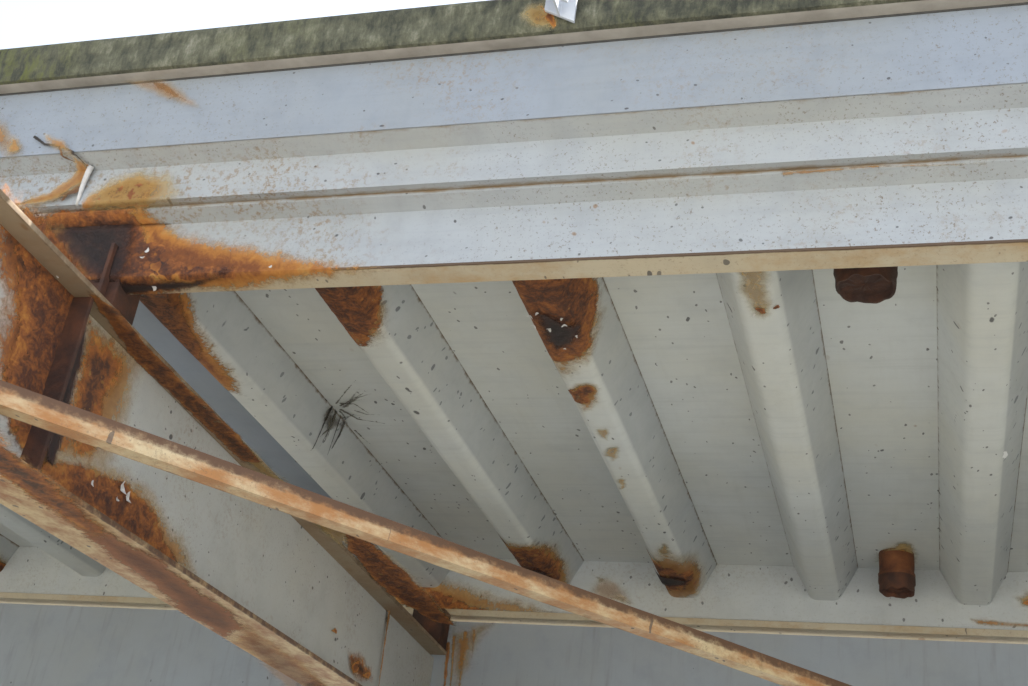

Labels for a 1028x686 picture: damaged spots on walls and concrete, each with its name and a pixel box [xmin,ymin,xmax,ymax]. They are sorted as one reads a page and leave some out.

rust [0,174,383,481]
rust [512,278,601,372]
rust [568,384,597,409]
rust [598,430,617,458]
rust [0,417,243,639]
rust [320,525,535,686]
rust [500,537,568,583]
rust [647,545,701,598]